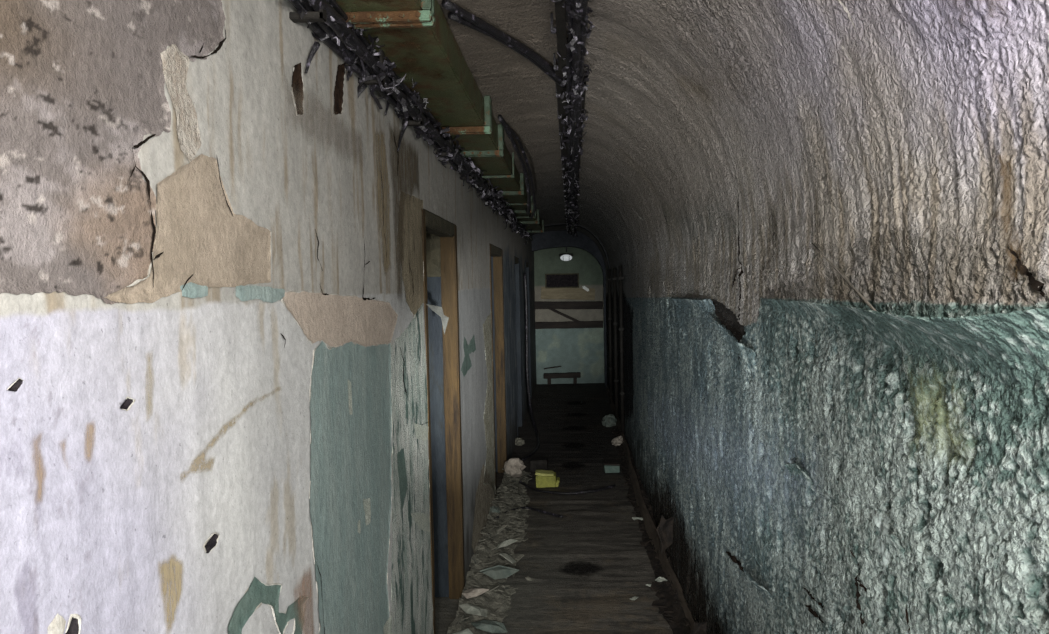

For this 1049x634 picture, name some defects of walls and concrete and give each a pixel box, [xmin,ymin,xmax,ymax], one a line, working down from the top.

spalling [0,0,271,305]
peeling [915,308,1049,396]
spalling [7,378,24,392]
spalling [120,396,136,411]
peeling [228,192,449,634]
spalling [203,532,220,553]
flaking render [48,613,81,634]